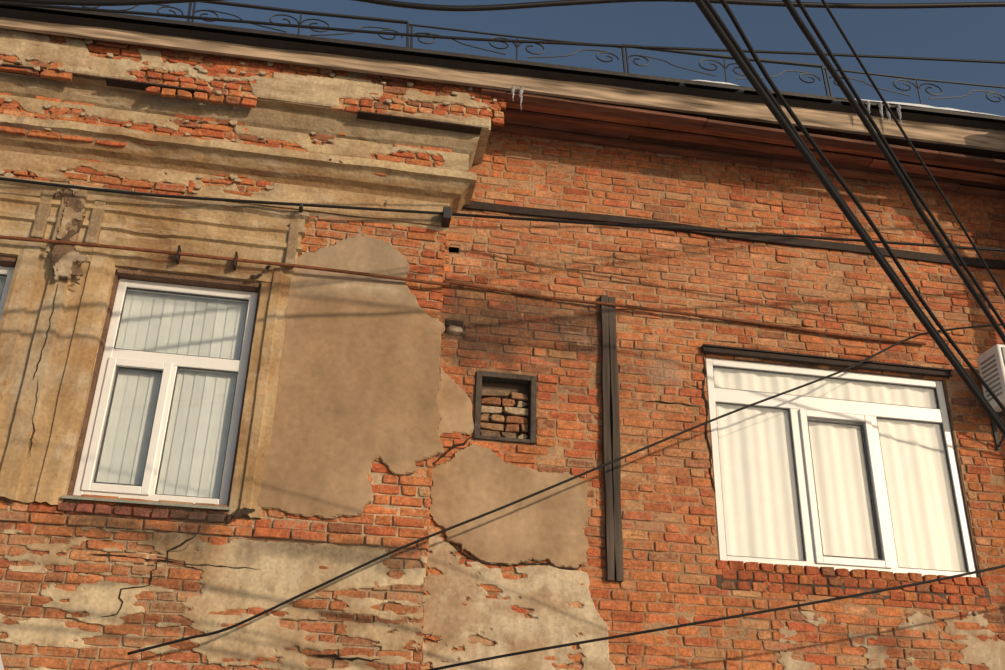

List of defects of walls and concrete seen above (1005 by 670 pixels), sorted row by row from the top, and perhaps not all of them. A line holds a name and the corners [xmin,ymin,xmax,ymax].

spalling [0,55,73,81]
spalling [35,33,506,126]
spalling [0,92,345,152]
spalling [370,144,452,167]
spalling [0,158,285,285]
crack [30,285,58,452]
peeling [0,235,615,670]
crack [92,529,253,617]
peeling [777,620,816,670]
peeling [799,611,827,626]
peeling [840,622,889,669]
peeling [897,611,1005,670]